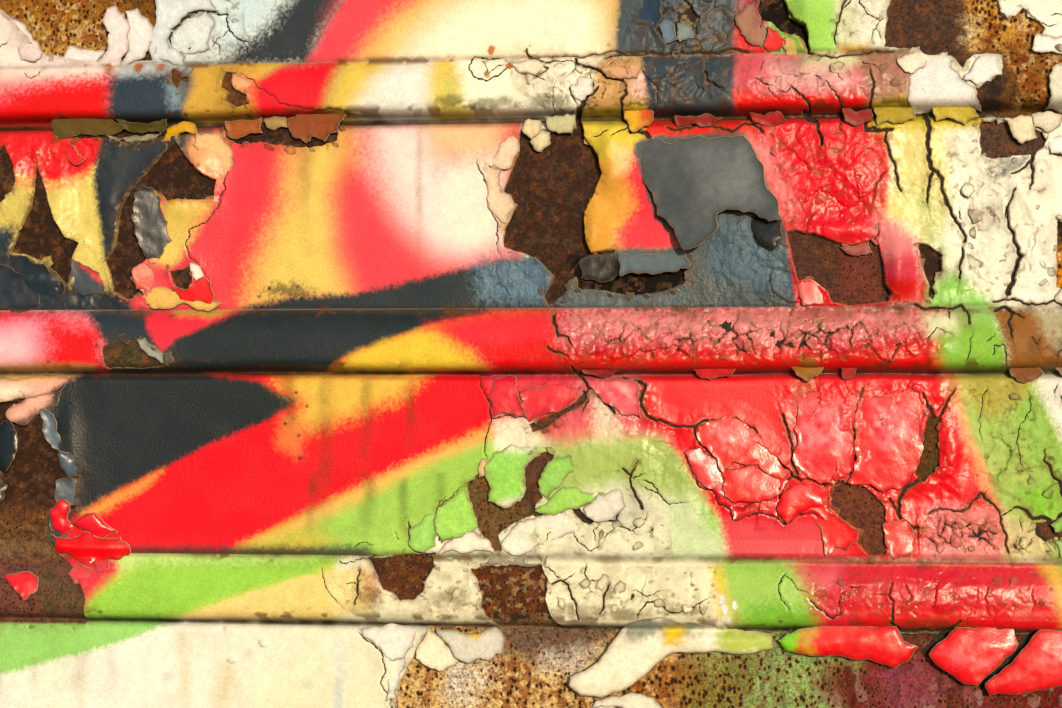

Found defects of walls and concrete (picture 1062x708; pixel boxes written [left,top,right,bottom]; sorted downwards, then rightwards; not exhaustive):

peeling [0,0,216,95]
peeling [842,0,1062,165]
peeling [0,68,346,313]
peeling [477,108,891,316]
crack [468,0,1062,415]
peeling [0,373,131,630]
crack [479,373,527,459]
crack [622,377,708,449]
crack [493,414,856,620]
peeling [359,444,1062,708]
peeling [684,366,941,565]
crack [778,384,1062,690]